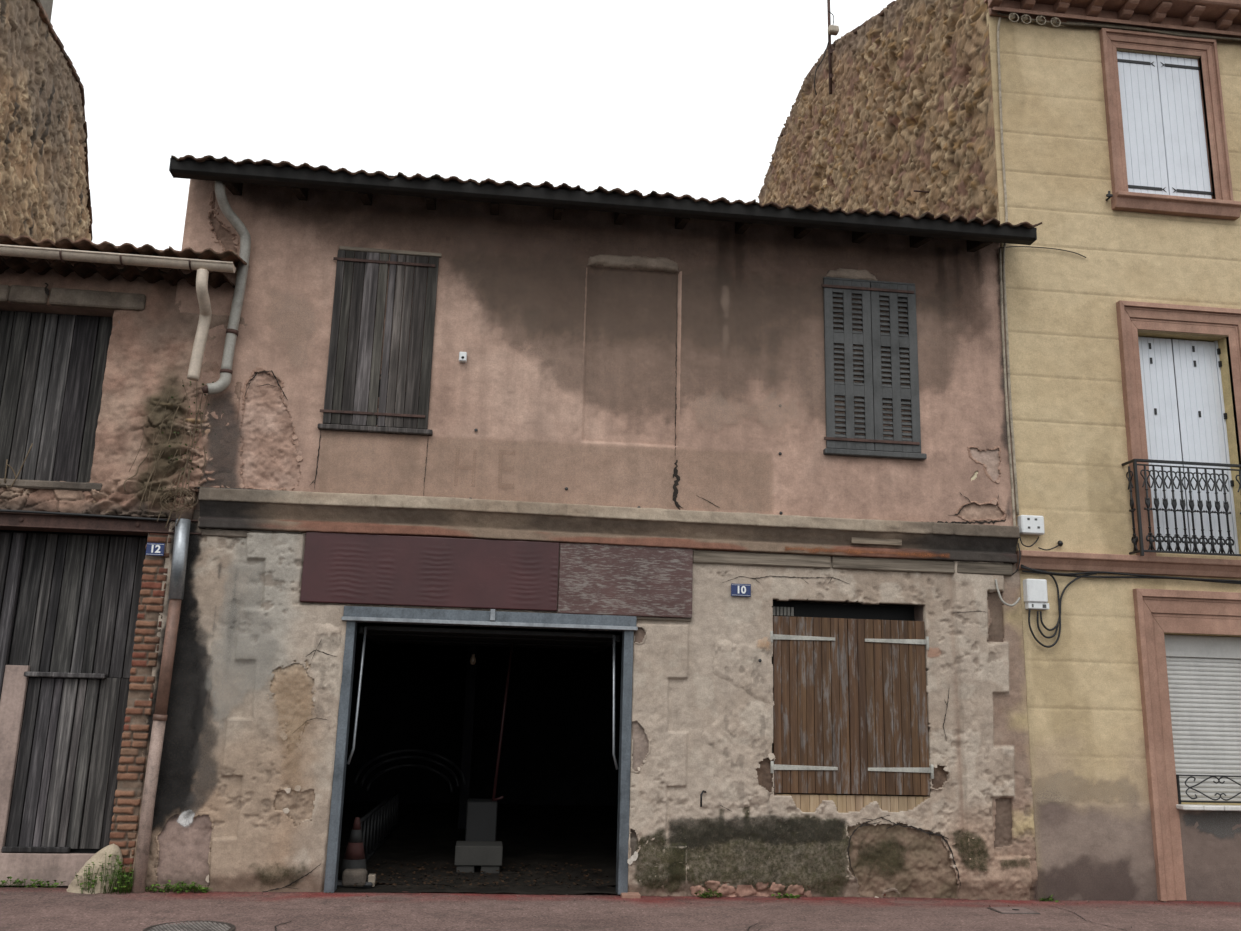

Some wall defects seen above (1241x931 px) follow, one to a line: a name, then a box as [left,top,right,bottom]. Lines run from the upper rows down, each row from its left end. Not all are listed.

crack [672,277,720,510]
peeling [967,445,1001,483]
peeling [955,498,1007,522]
spalling [633,625,647,645]
spalling [630,719,652,774]
spalling [755,753,777,795]
spalling [929,764,950,791]